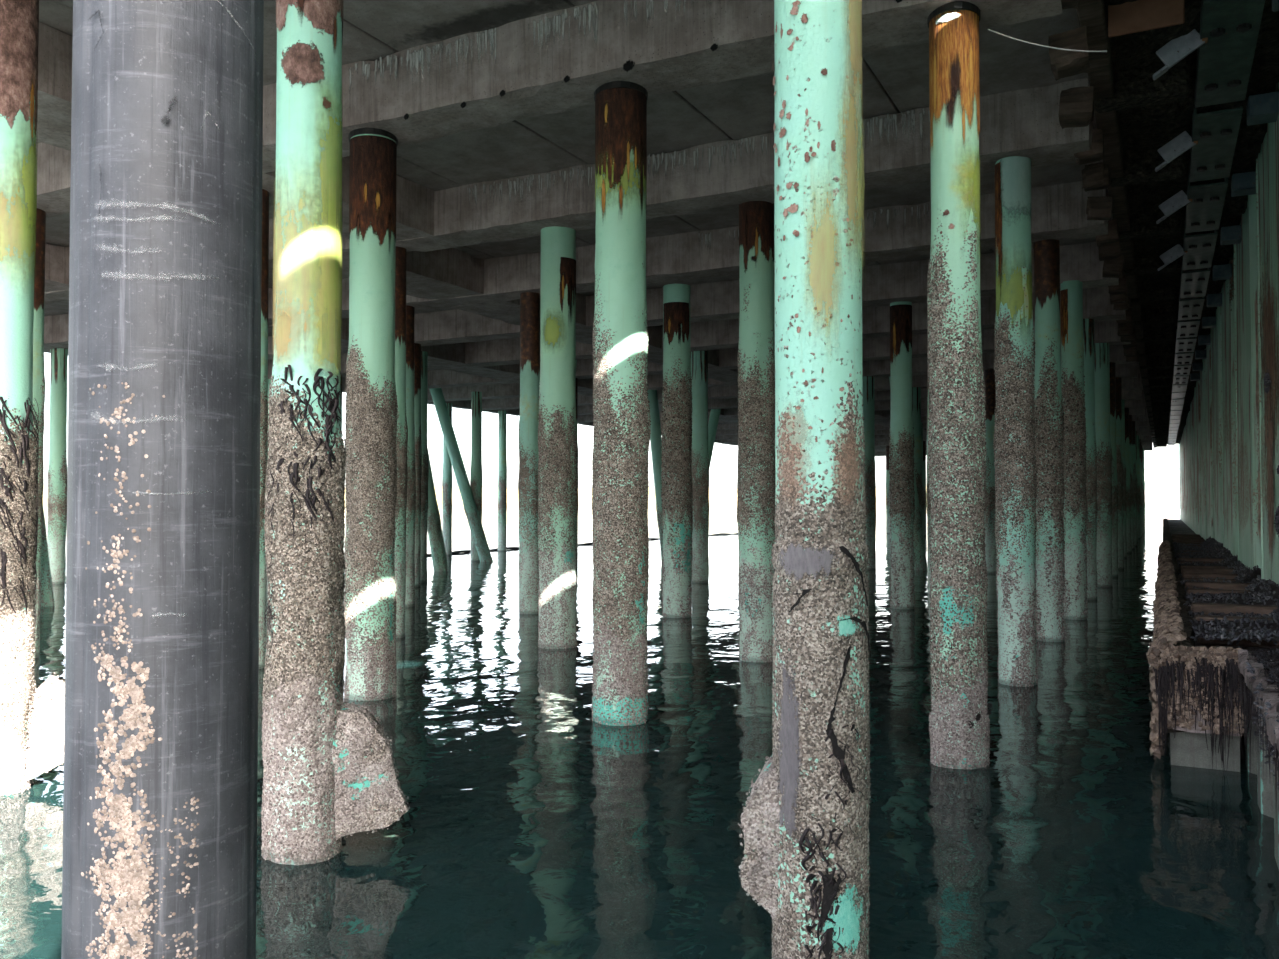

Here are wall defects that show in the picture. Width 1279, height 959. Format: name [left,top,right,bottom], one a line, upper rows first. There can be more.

rust [0,0,39,139]
rust [276,0,343,86]
rust [929,10,980,146]
rust [349,135,397,248]
rust [595,88,647,216]
rust [739,201,774,273]
rust [560,257,576,319]
rust [663,302,690,344]
crack [789,589,812,612]
peeling [778,542,840,581]
crack [825,546,871,794]
crack [819,874,842,959]